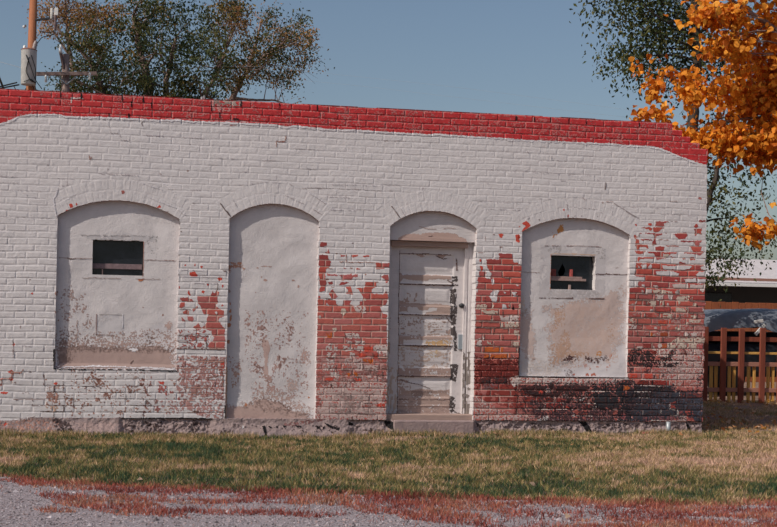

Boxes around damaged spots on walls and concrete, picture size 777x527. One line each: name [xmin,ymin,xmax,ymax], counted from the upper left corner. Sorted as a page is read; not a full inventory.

flaking render [125,220,706,435]
water stain [473,281,705,422]